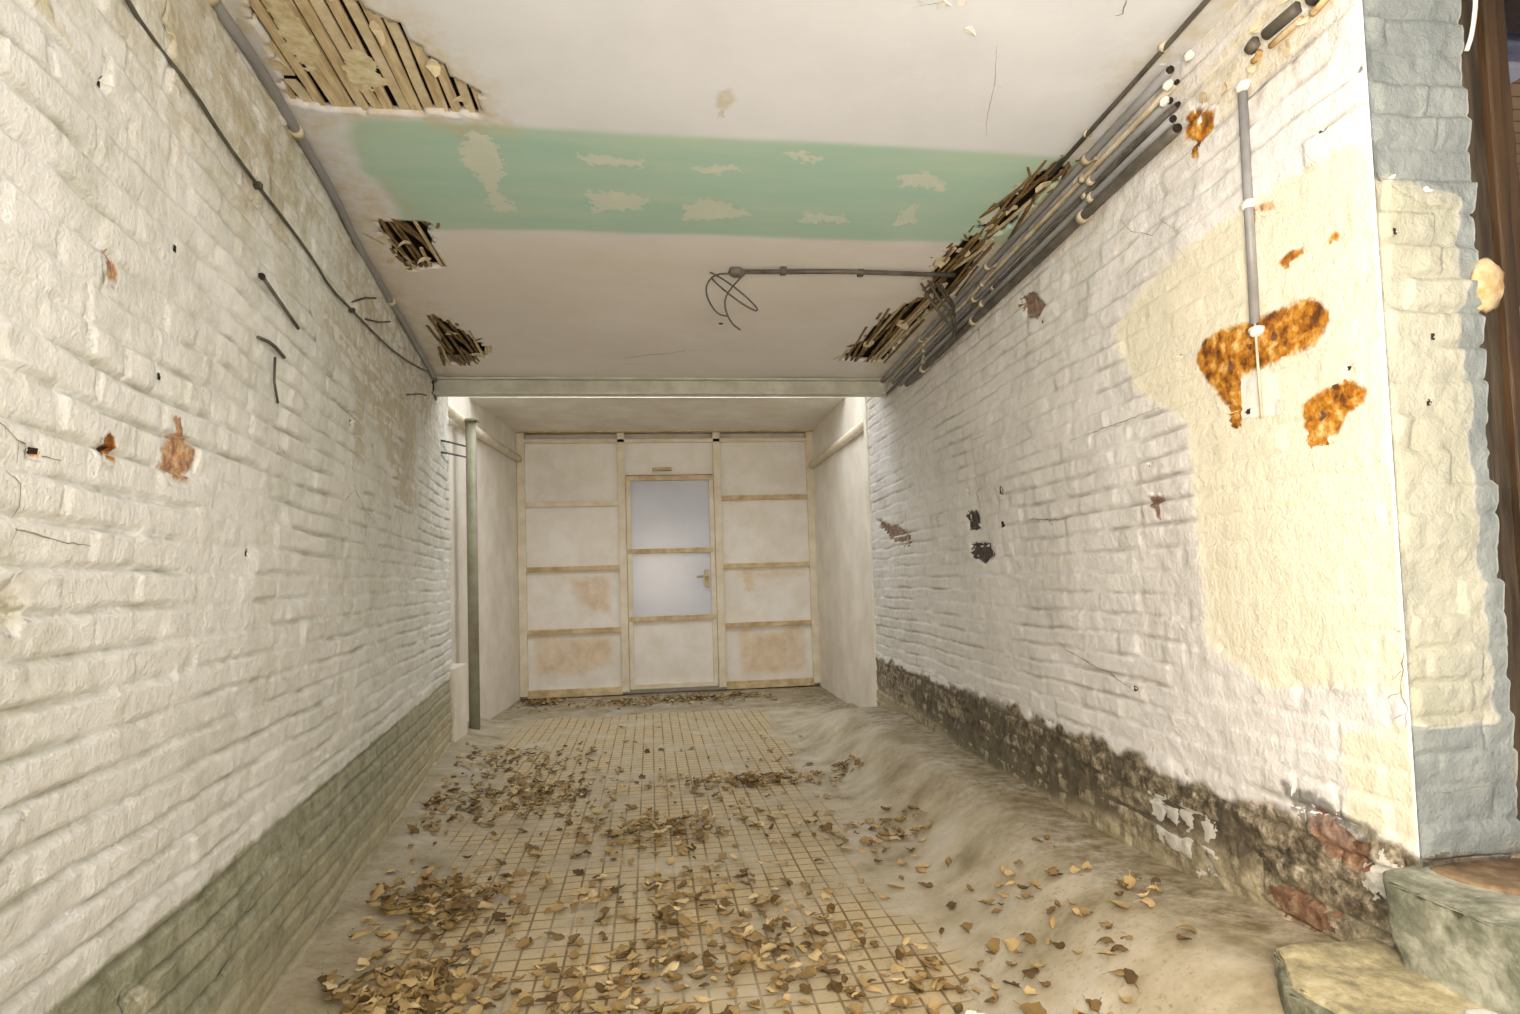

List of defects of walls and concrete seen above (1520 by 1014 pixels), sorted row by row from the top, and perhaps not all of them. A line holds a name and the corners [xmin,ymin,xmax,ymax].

spalling [250,0,482,113]
corrosion [1181,102,1219,159]
spalling [362,218,445,270]
spalling [833,155,1079,363]
spalling [426,314,492,366]
corrosion [1192,290,1337,429]
corrosion [1298,374,1372,448]
peeling [0,571,33,638]
leakage [903,661,1270,879]
spalling [1308,807,1374,872]
leakage [1269,767,1516,903]